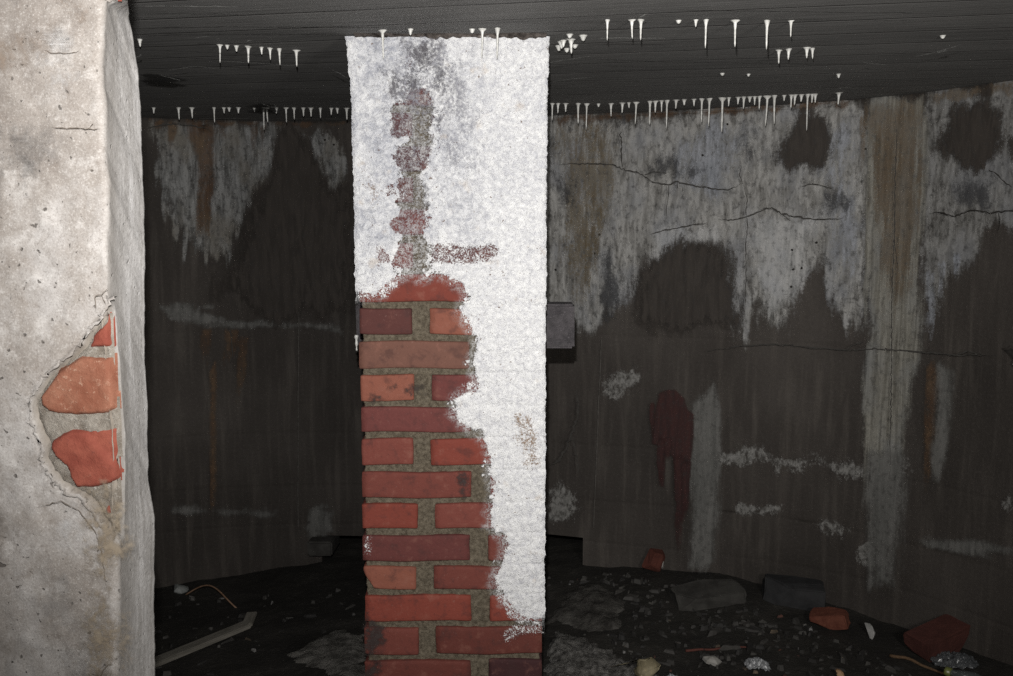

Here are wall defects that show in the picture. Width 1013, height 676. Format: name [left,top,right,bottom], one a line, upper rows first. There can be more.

water stain [354,33,547,59]
flaking render [27,294,124,533]
water stain [151,118,356,332]
peeling [345,36,557,640]
crack [569,133,841,313]
water stain [546,81,1013,588]
crack [707,118,997,475]